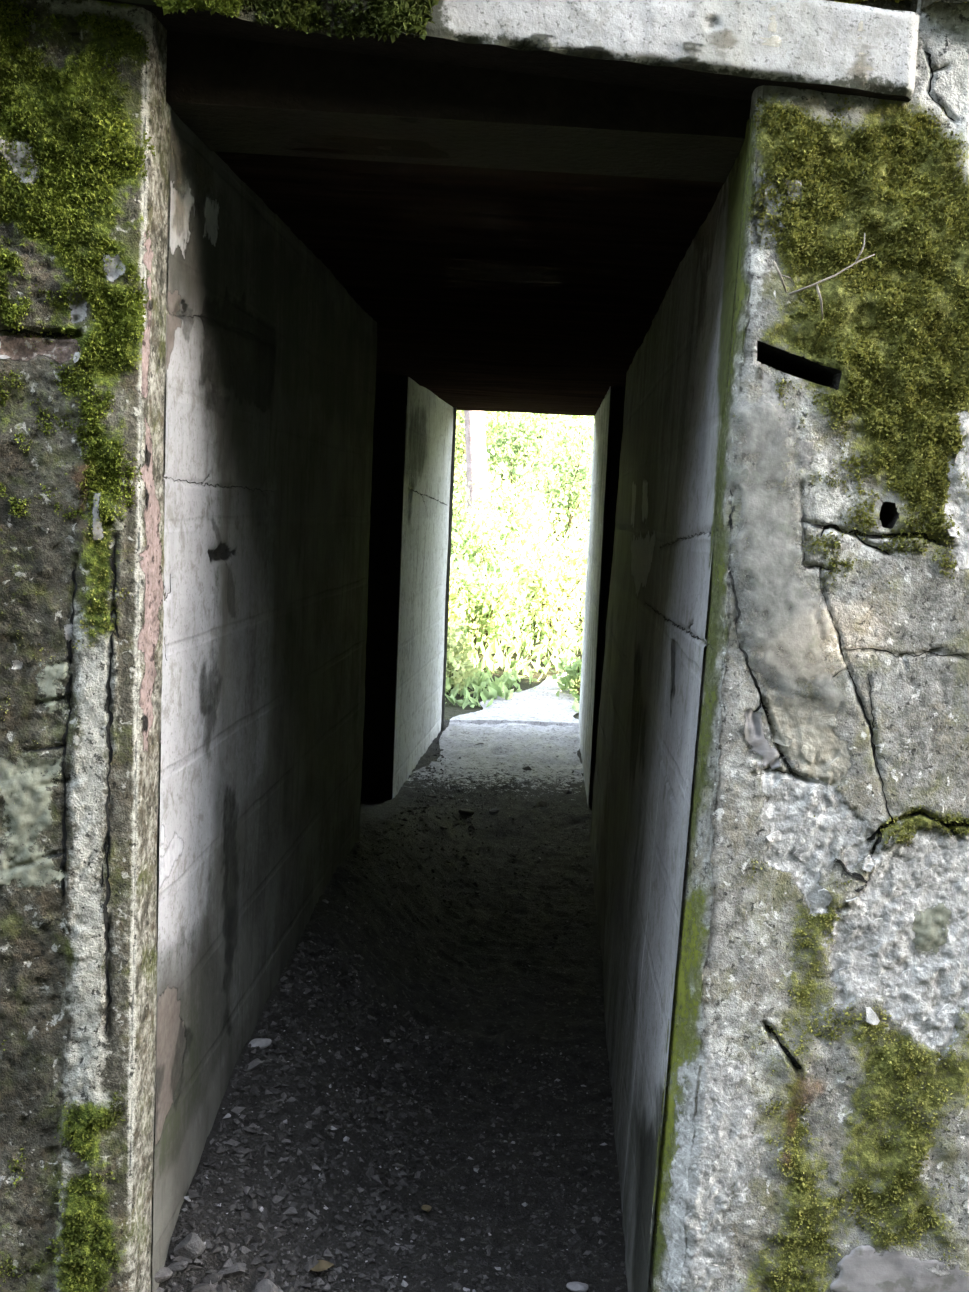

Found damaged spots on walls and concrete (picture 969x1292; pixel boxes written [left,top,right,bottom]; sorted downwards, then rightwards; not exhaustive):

crack [924,51,956,122]
crack [0,328,77,340]
crack [20,559,77,902]
crack [101,540,119,1034]
crack [800,484,969,858]
peeling [827,1245,969,1292]